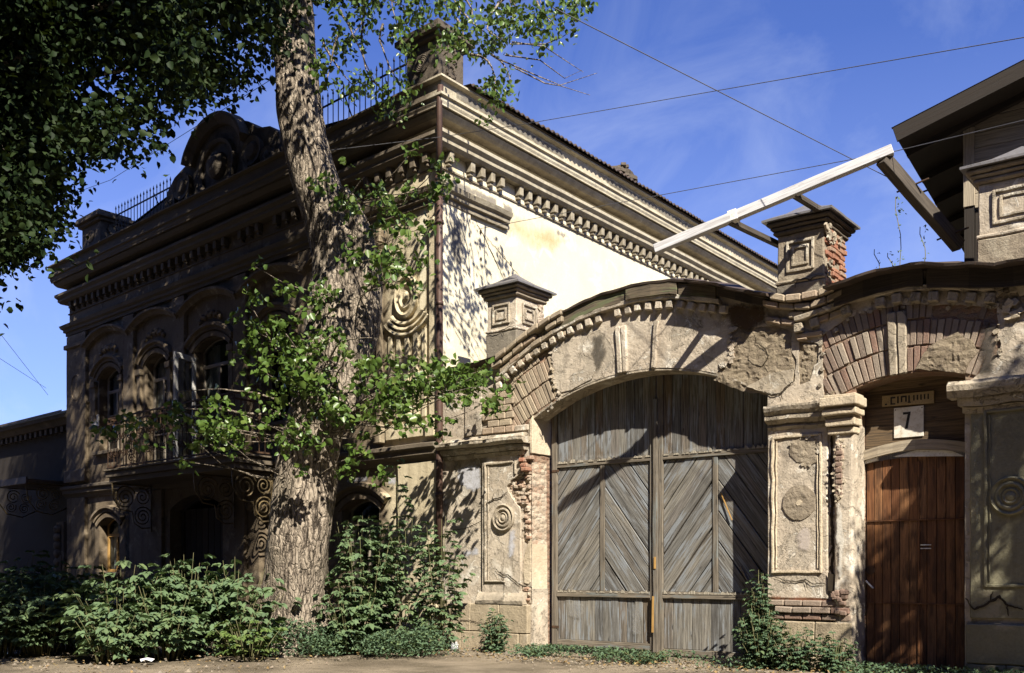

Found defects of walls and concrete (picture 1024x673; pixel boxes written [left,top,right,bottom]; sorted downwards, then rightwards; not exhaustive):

flaking render [824,222,847,285]
flaking render [714,286,1024,395]
peeling [508,472,525,557]
peeling [831,434,846,577]
crack [965,592,1023,616]